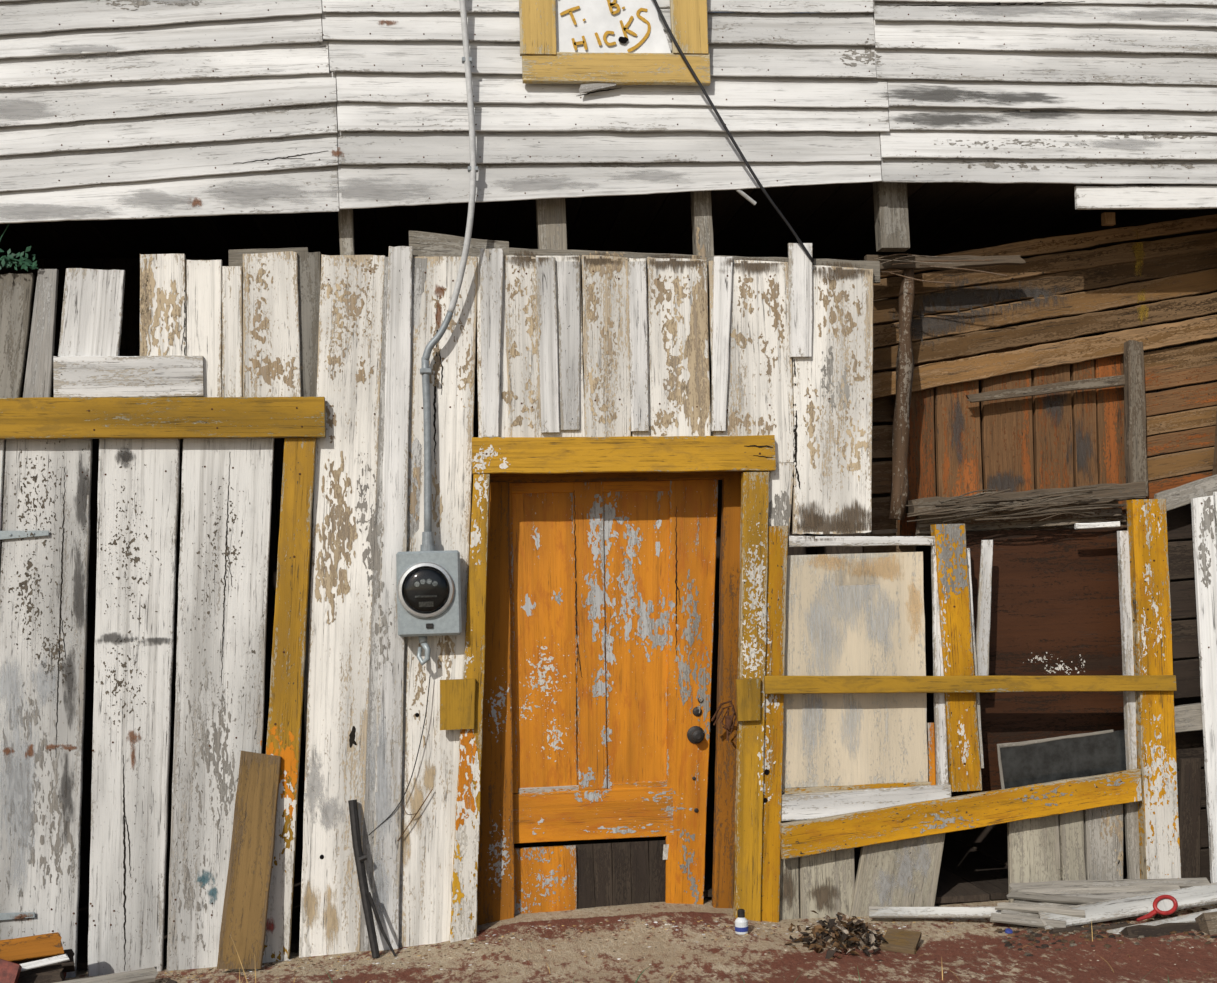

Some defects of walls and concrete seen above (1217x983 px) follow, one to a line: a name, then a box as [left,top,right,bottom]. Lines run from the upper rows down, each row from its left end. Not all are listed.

damp [885,87,1069,127]
peeling [320,257,379,391]
peeling [647,227,776,436]
peeling [729,270,786,383]
peeling [803,267,870,480]
peeling [0,441,162,917]
peeling [312,401,393,676]
peeling [485,637,572,762]
peeling [581,491,712,741]
peeling [741,491,791,804]
damp [797,501,871,541]
peeling [1138,499,1166,675]